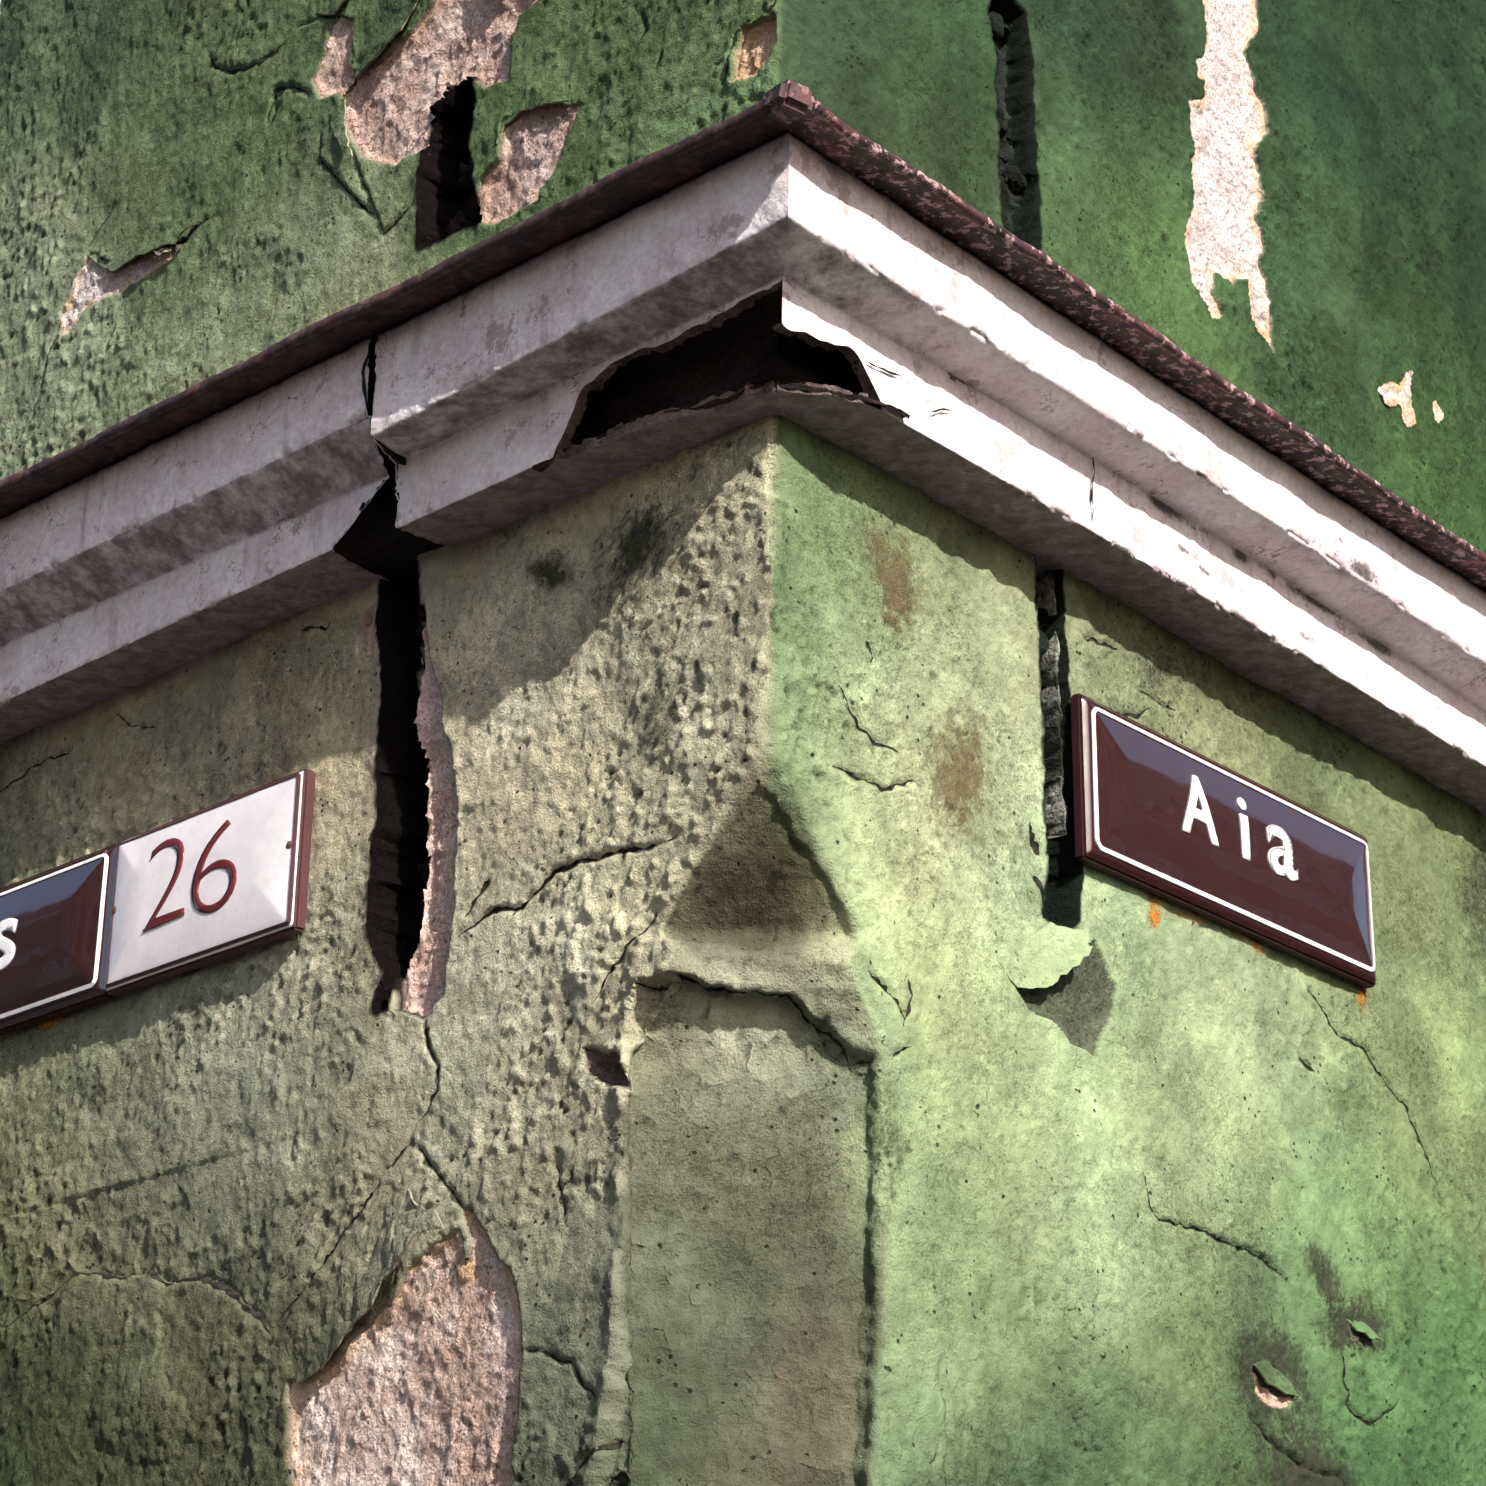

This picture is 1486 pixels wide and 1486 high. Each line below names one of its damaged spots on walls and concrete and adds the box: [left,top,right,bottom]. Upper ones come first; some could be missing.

peeling [268,0,537,233]
crack [446,157,482,236]
peeling [480,89,580,224]
crack [988,11,1027,234]
peeling [1184,0,1271,346]
spalling [563,288,910,452]
peeling [1378,371,1416,428]
crack [1029,570,1118,903]
crack [1108,689,1175,718]
crack [0,454,677,1347]
spalling [286,1189,522,1486]
crack [1145,1176,1285,1279]